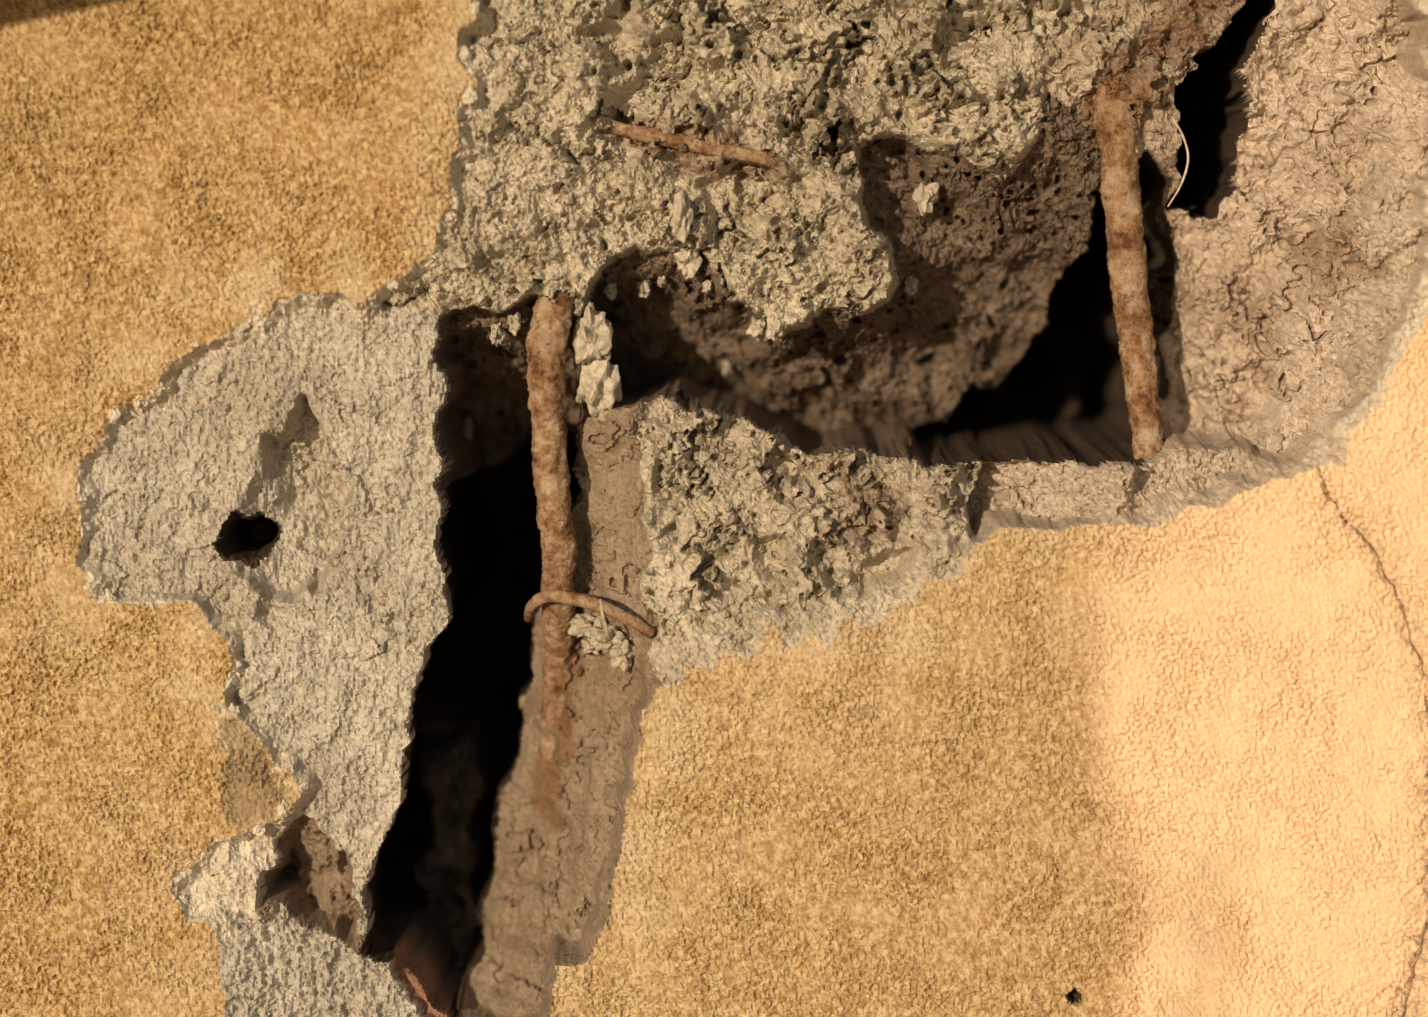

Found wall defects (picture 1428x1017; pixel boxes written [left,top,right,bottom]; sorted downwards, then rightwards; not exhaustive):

flaking render [77,291,456,1017]
spalling [351,0,1428,689]
crack [1316,465,1428,711]
crack [1378,923,1428,1017]